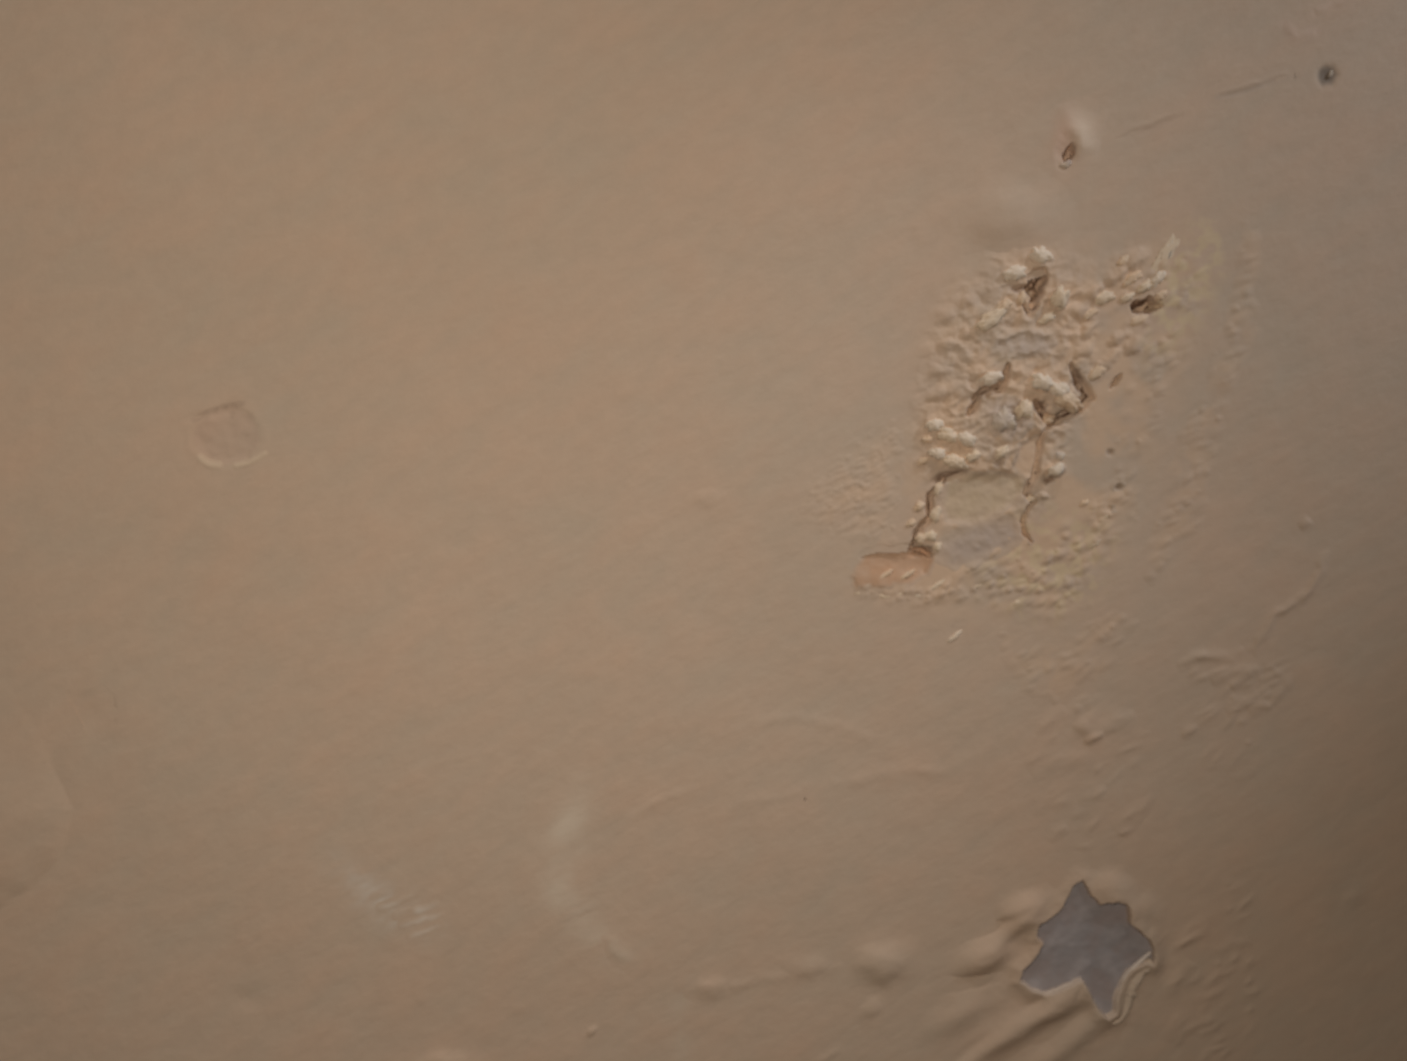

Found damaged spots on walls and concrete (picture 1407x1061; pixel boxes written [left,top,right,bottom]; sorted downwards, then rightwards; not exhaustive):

hole [1033,96,1138,187]
peeling [816,205,1233,645]
spalling [913,861,1174,1061]